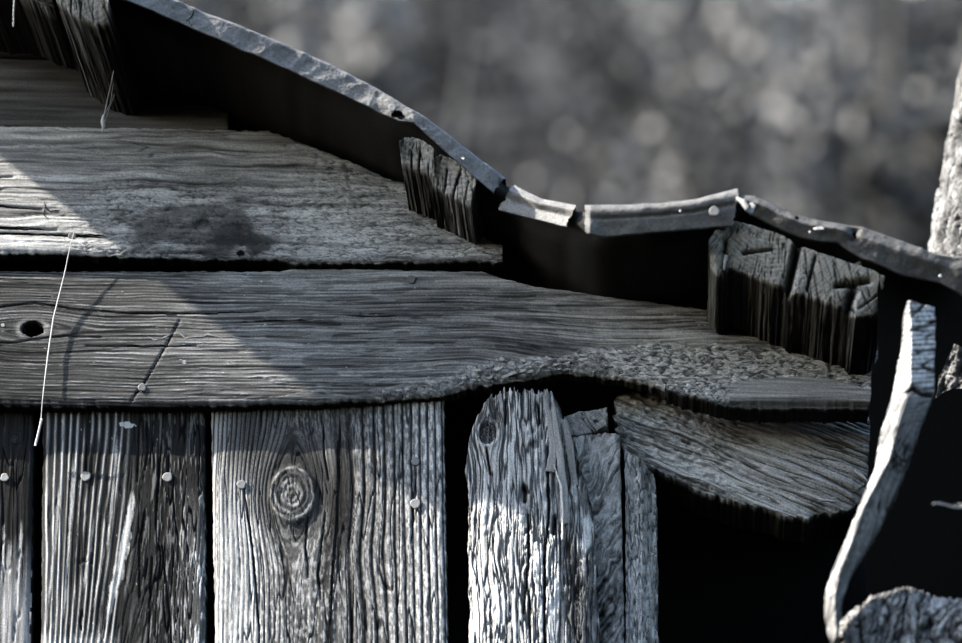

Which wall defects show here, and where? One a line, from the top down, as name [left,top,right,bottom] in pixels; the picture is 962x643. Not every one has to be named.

crack [0,302,305,400]
crack [0,451,8,524]
crack [136,423,172,643]
crack [244,492,260,643]